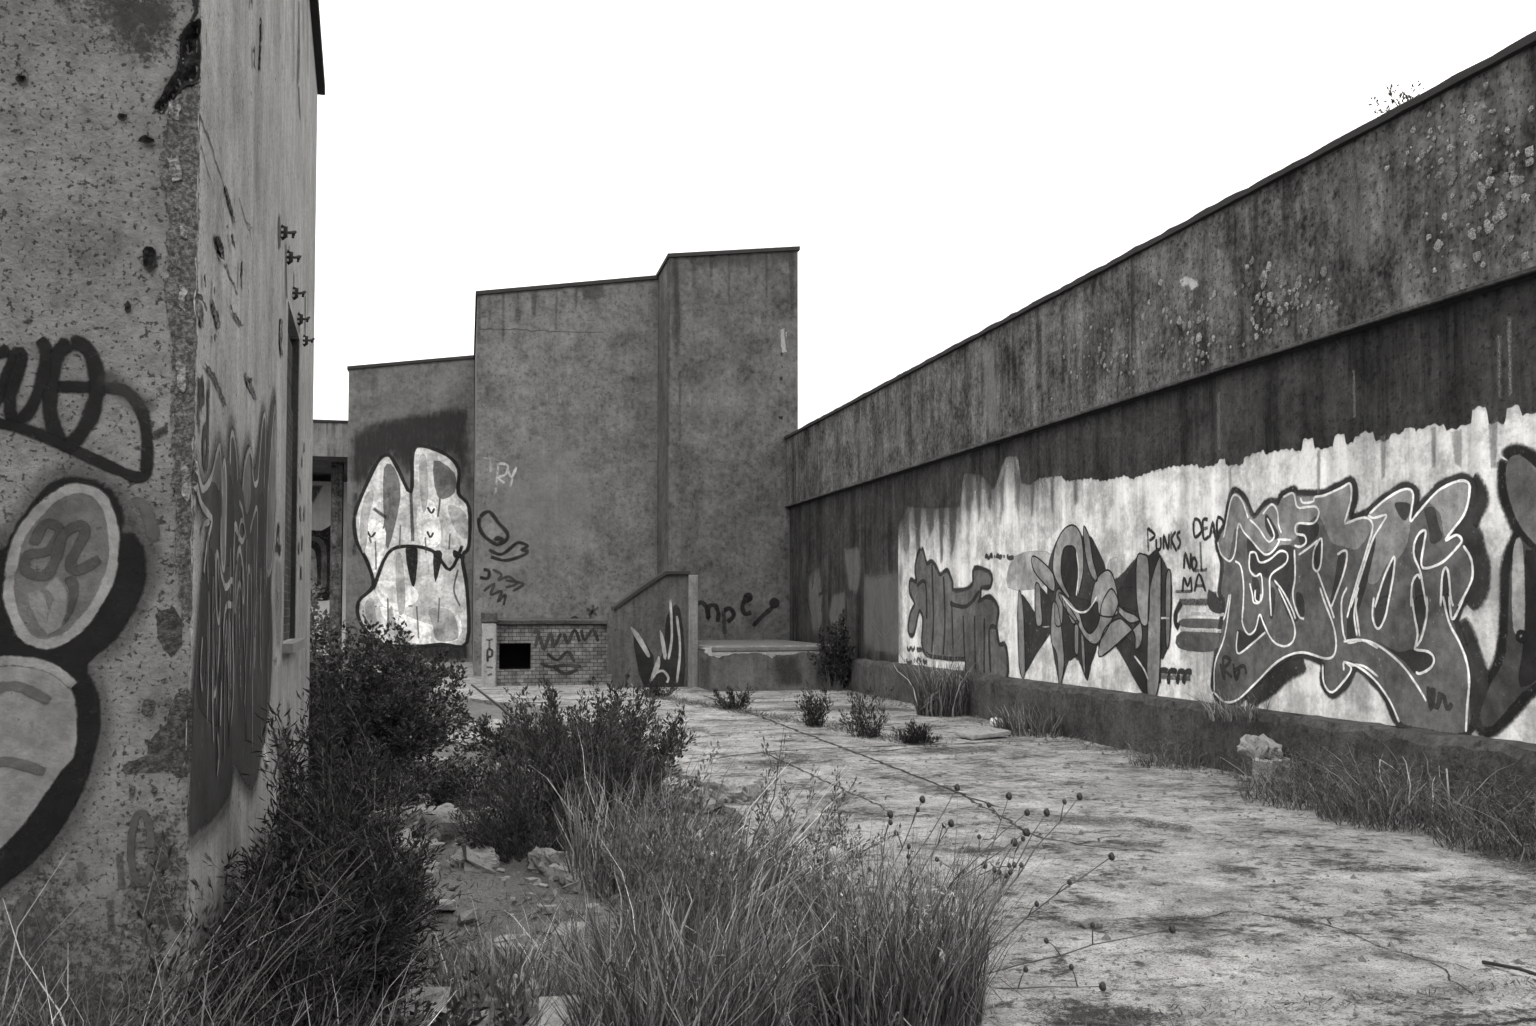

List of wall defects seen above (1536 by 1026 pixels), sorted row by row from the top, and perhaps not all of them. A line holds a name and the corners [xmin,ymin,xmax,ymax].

leakage [58,0,175,63]
crack [199,107,256,319]
spalling [138,18,243,657]
peeling [121,678,193,798]
crack [1049,1018,1111,1026]
crack [1160,910,1536,1026]